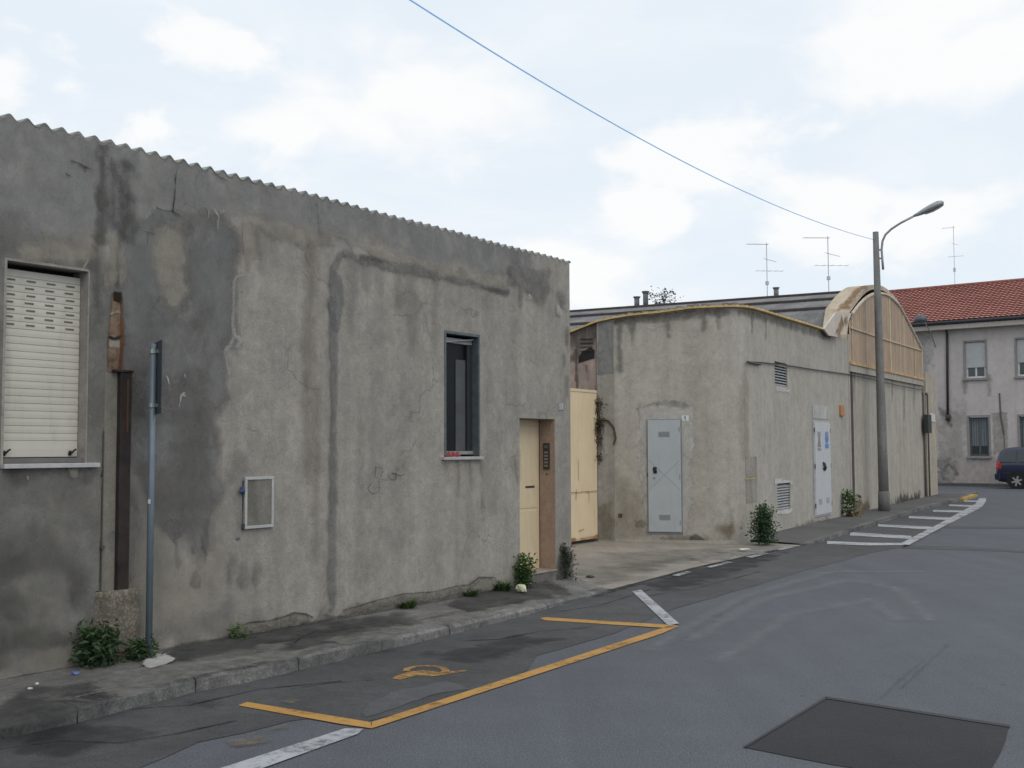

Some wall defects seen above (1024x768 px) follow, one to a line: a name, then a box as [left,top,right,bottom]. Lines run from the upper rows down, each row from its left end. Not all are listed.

water stain [0,212,239,669]
water stain [508,266,565,306]